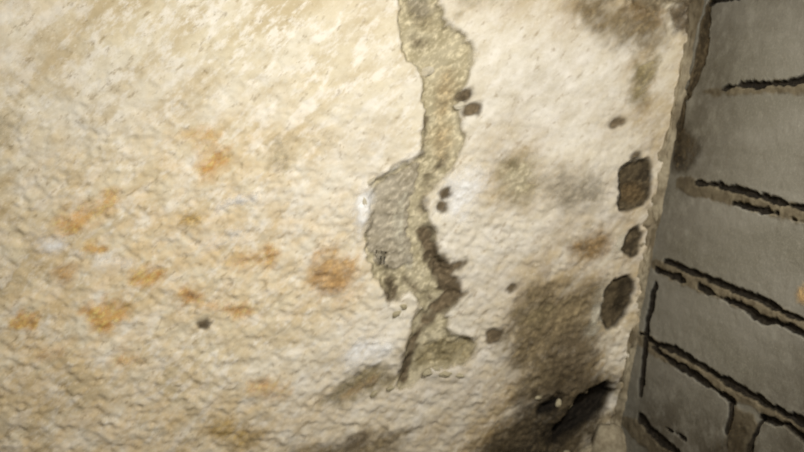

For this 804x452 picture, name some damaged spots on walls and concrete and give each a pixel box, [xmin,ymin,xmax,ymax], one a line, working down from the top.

damp [580,0,661,45]
damp [670,0,696,31]
crack [677,0,733,128]
crack [722,76,804,91]
spalling [610,117,625,128]
flaking render [321,0,481,403]
crack [695,180,804,221]
corrosion [310,250,354,290]
corrosion [87,305,128,329]
spalling [486,329,503,344]
damp [487,283,611,452]
crack [638,259,804,452]